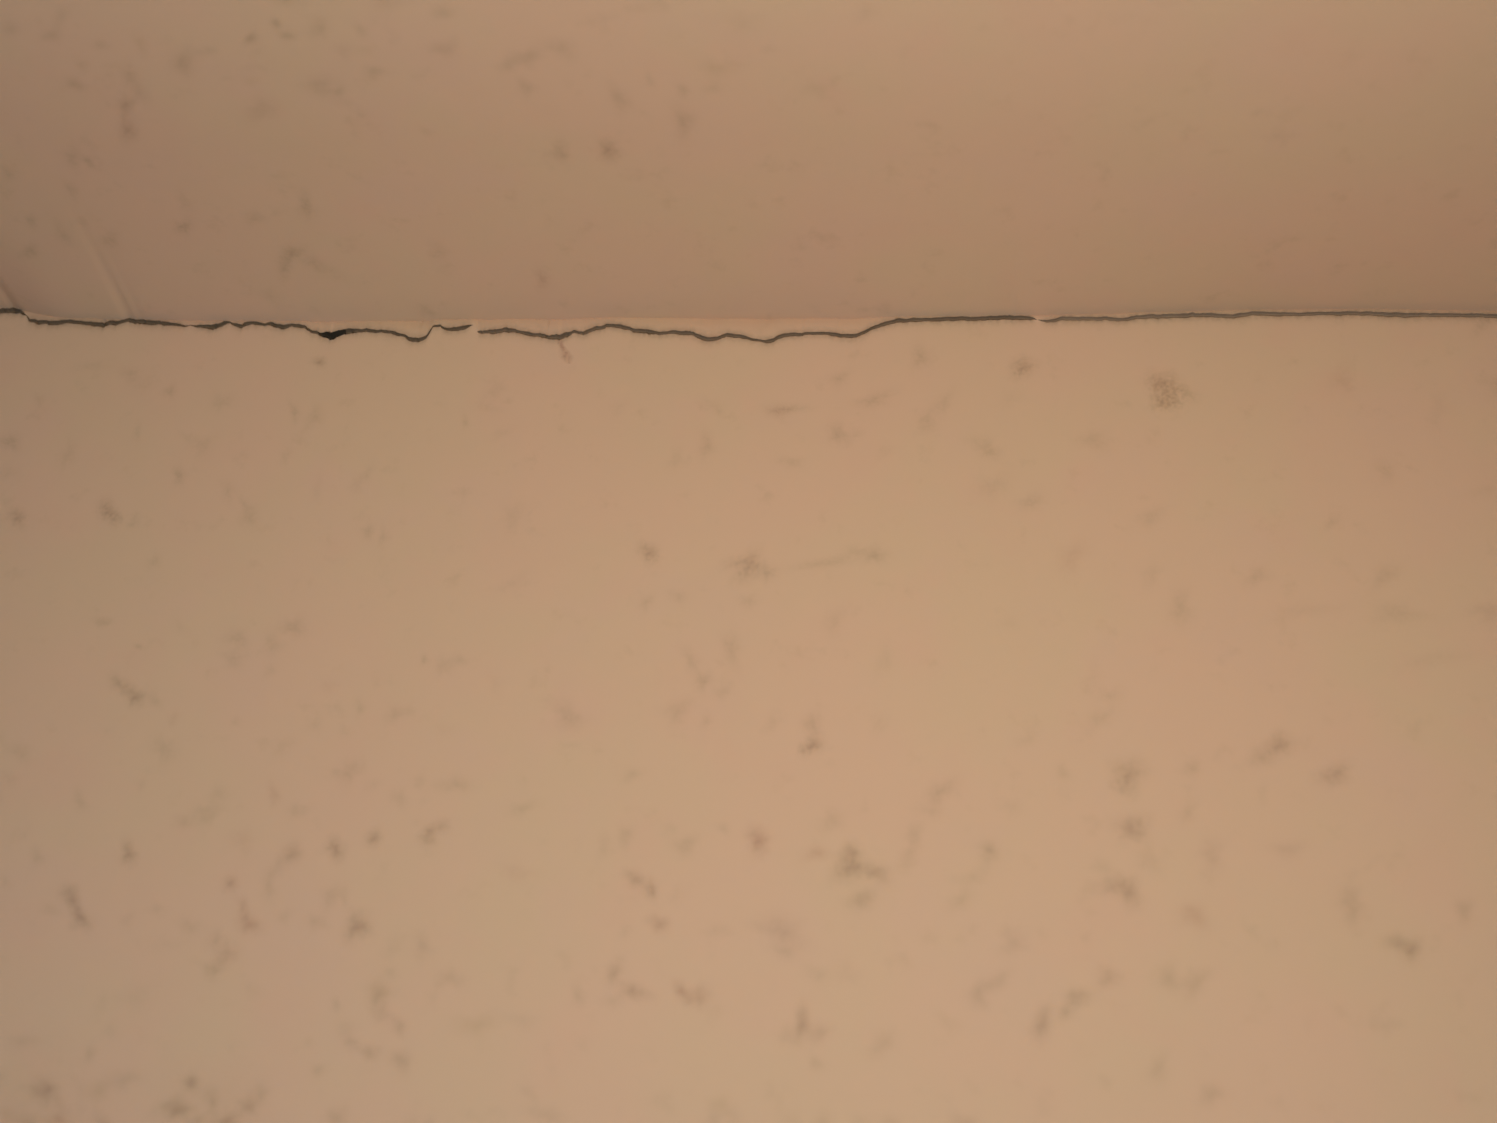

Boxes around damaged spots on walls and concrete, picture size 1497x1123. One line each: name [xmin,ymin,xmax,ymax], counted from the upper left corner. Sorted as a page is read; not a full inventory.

crack [0,307,1497,343]